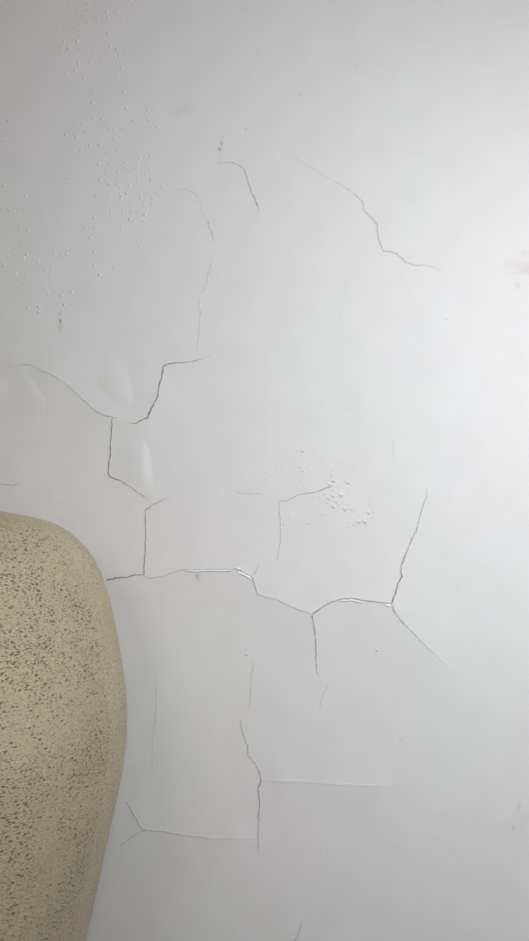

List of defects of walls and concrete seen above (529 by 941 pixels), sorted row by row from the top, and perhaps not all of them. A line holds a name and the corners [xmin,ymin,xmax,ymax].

crack [217,161,260,215]
crack [292,155,442,272]
crack [18,188,449,711]
crack [119,659,390,854]